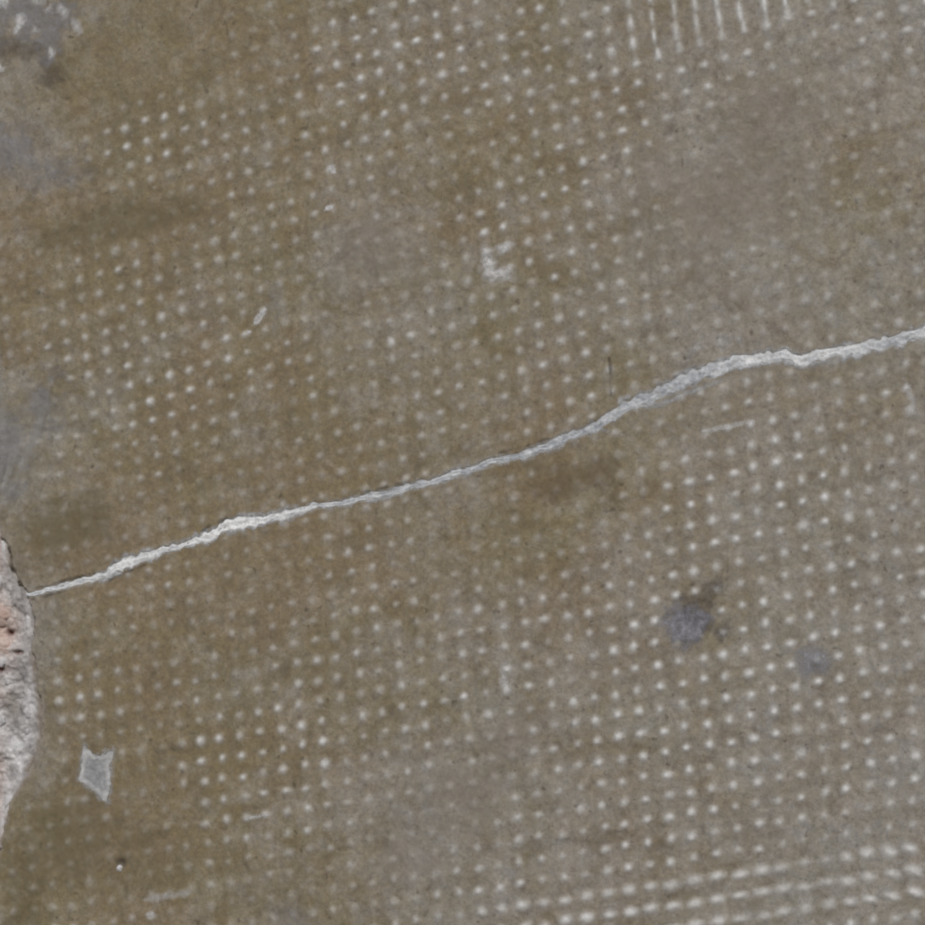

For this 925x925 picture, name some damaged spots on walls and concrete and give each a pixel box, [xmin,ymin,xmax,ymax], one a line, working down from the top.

crack [8,323,925,596]
spalling [0,531,43,851]